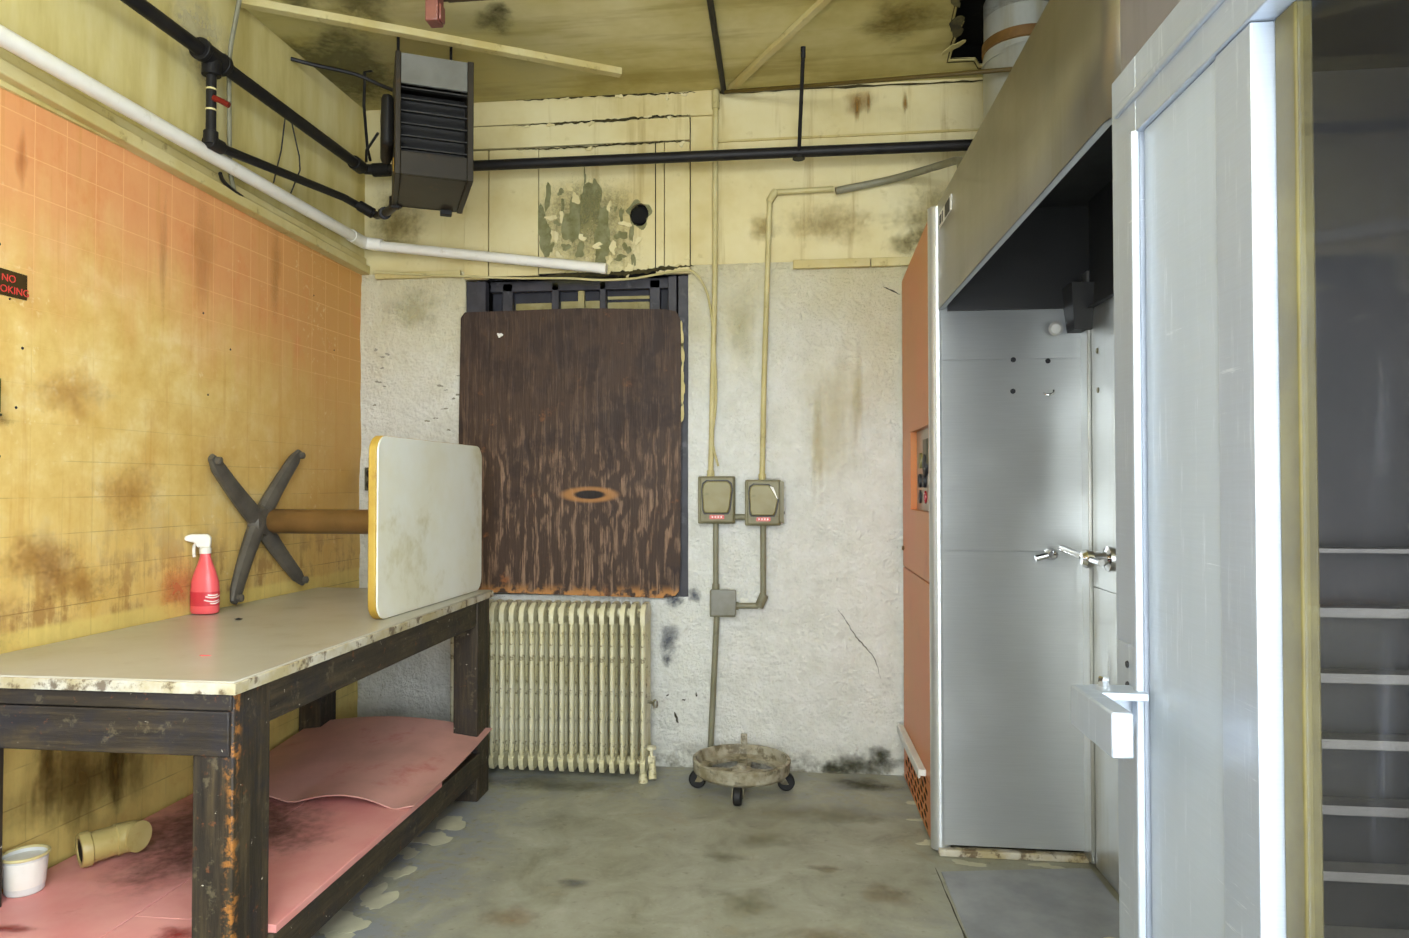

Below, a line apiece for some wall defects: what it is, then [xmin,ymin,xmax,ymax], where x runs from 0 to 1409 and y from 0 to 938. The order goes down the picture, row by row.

peeling [516,91,695,128]
peeling [516,140,693,278]
damp [823,750,889,789]